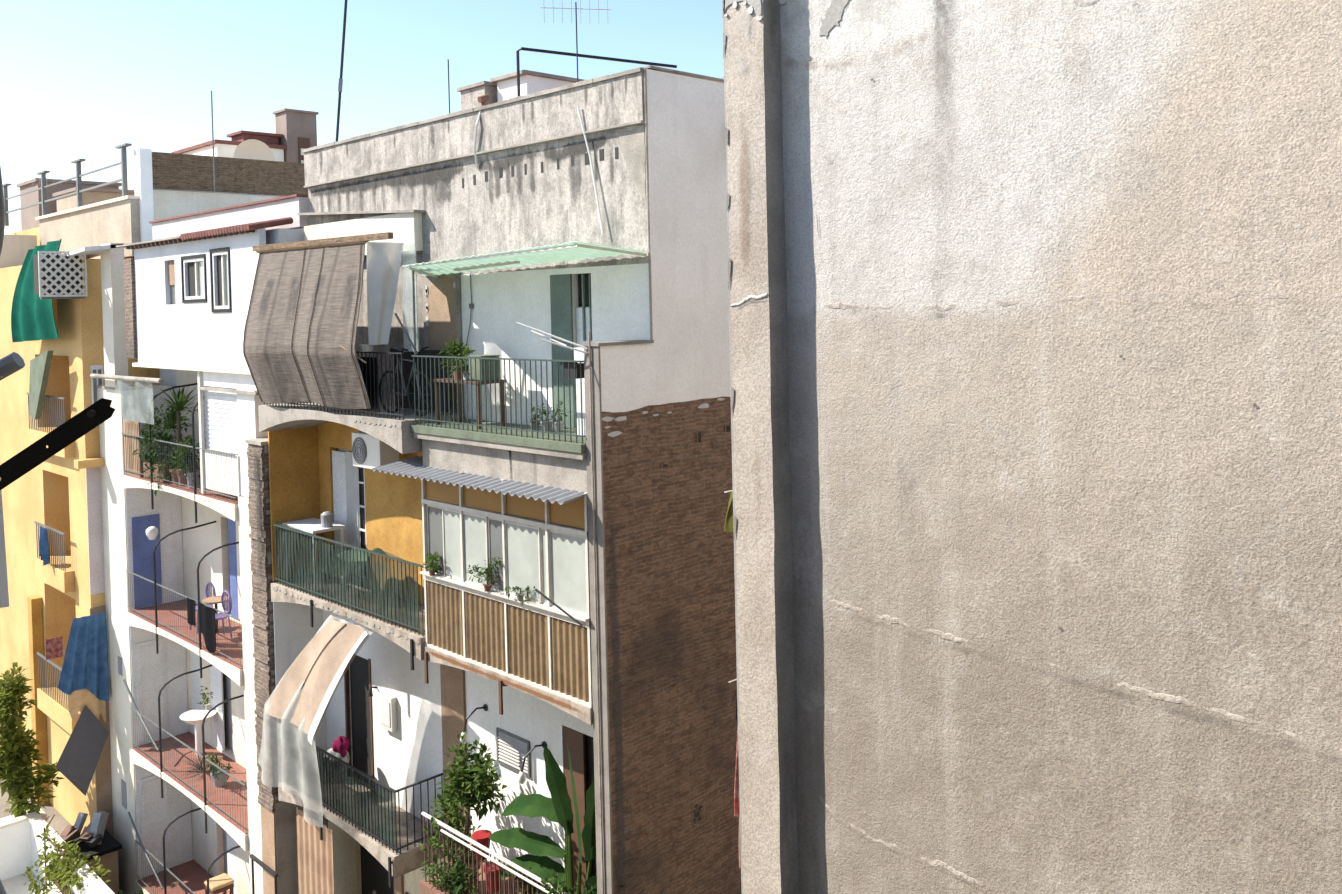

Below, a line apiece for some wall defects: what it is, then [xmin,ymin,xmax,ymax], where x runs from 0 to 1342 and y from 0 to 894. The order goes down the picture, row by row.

flaking render [722,0,763,71]
flaking render [819,0,849,39]
water stain [312,164,462,212]
water stain [478,137,613,198]
spalling [698,387,734,432]
crack [829,599,968,643]
crack [1112,682,1342,752]
crack [819,795,982,885]